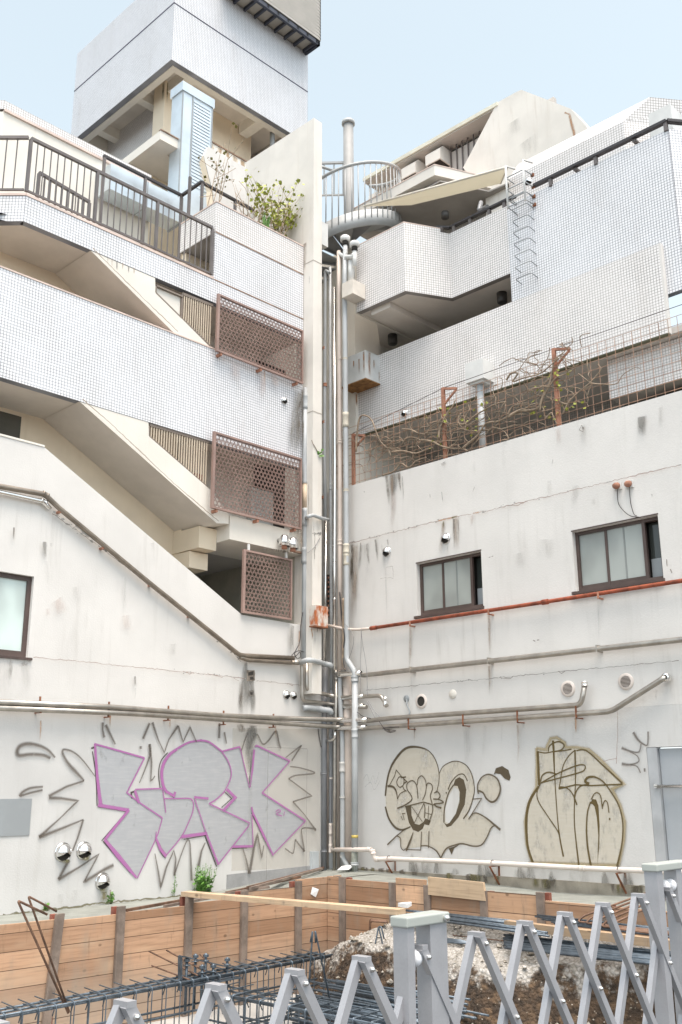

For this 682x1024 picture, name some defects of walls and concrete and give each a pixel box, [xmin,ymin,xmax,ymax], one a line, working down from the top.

damp [385,473,403,492]
damp [239,663,255,706]
damp [241,725,256,762]